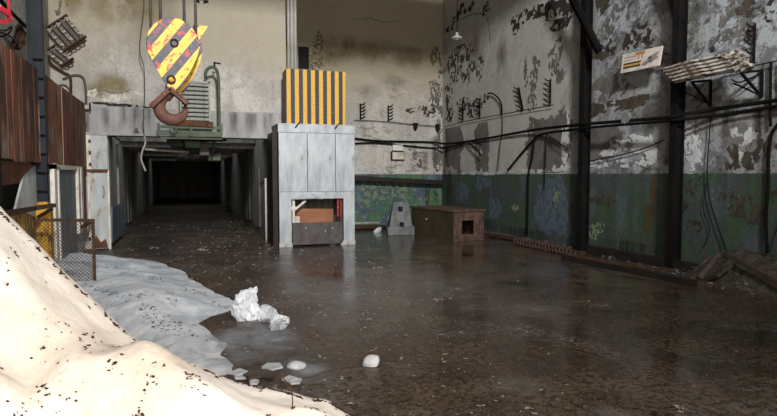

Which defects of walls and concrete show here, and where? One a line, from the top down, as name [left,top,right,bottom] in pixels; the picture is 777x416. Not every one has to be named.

peeling [592,0,654,61]
peeling [687,0,775,53]
flaking render [406,0,573,239]
flaking render [590,71,657,169]
flaking render [725,127,765,171]